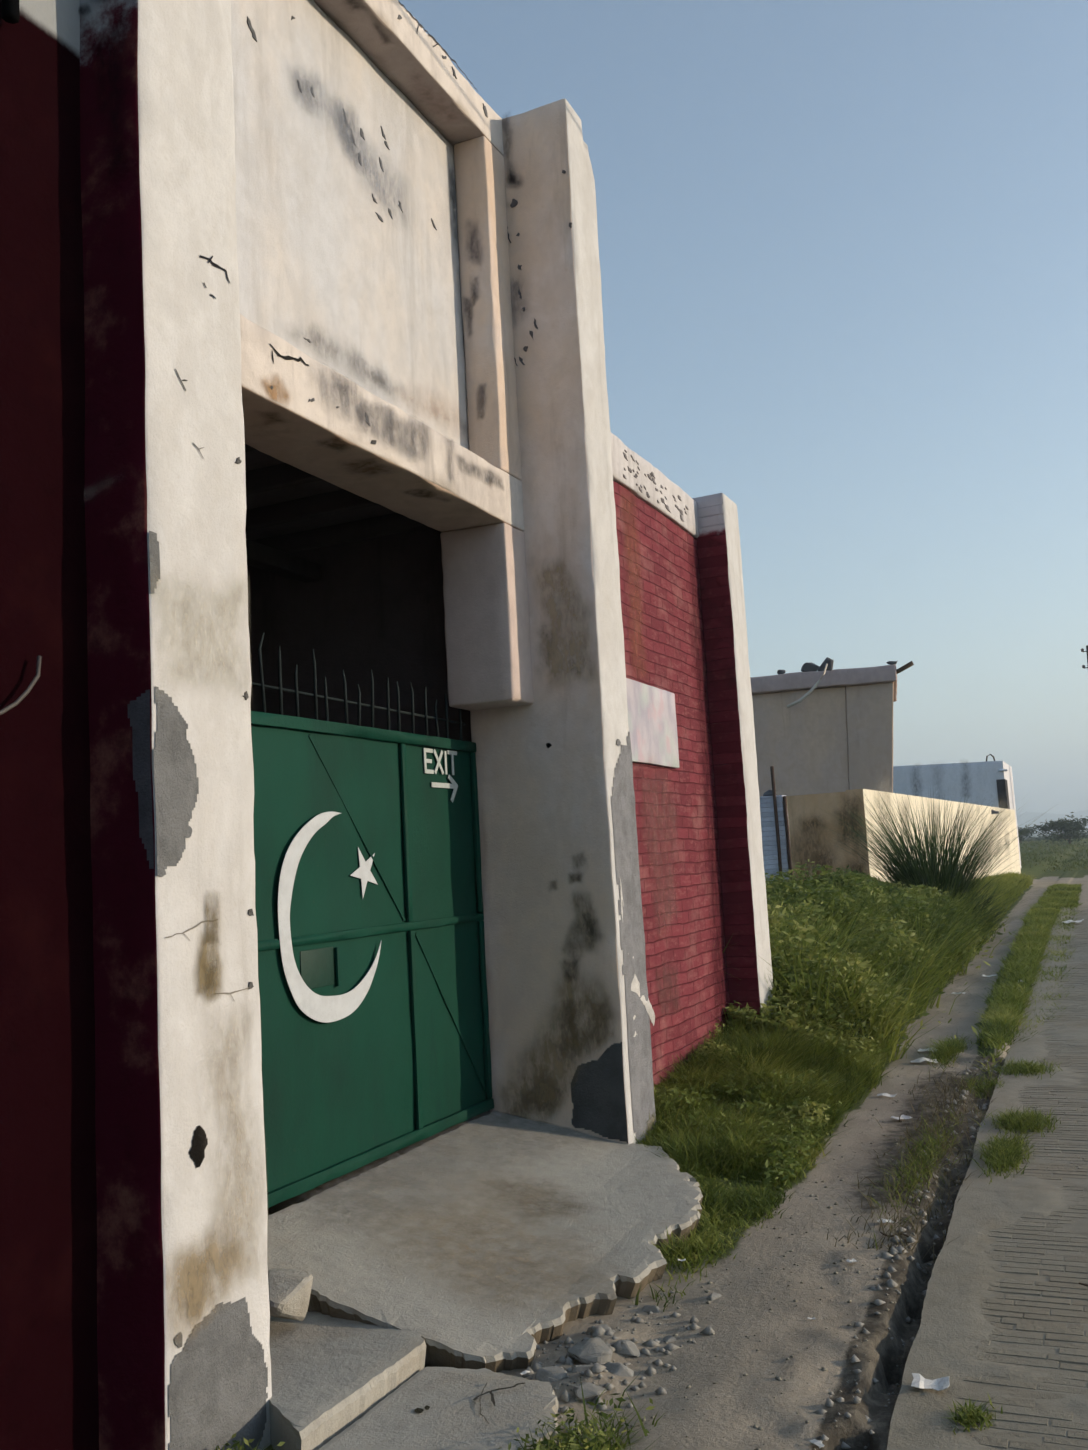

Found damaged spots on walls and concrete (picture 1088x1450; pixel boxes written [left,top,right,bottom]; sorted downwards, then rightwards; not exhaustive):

peeling [623,450,689,522]
spalling [127,686,199,877]
spalling [570,732,656,1144]
water stain [510,978,607,1118]
spalling [169,1297,268,1450]